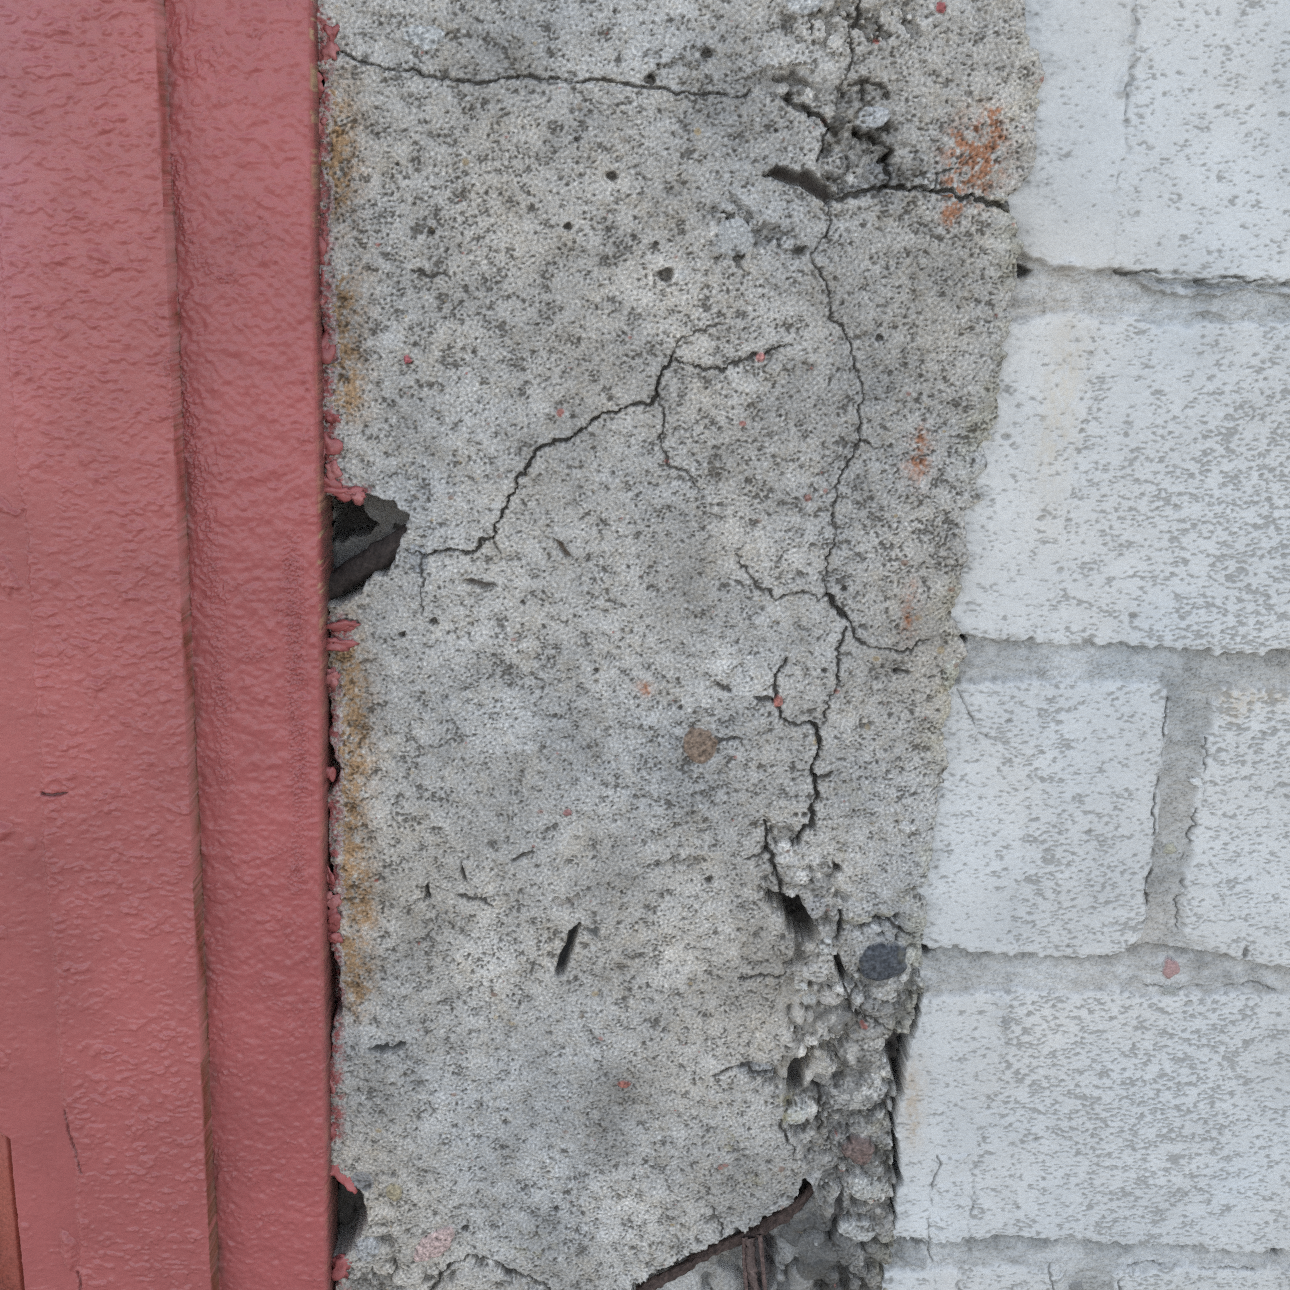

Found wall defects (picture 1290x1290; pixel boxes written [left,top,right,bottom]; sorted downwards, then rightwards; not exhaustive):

crack [338,48,752,100]
rust [925,83,1027,233]
crack [409,267,448,280]
crack [404,321,794,616]
crack [714,0,1010,894]
spalling [329,524,407,600]
crack [456,893,496,909]
spalling [656,855,705,872]
crack [852,914,919,937]
spalling [767,976,860,1104]
rust [0,1133,25,1290]
spalling [633,1178,838,1290]